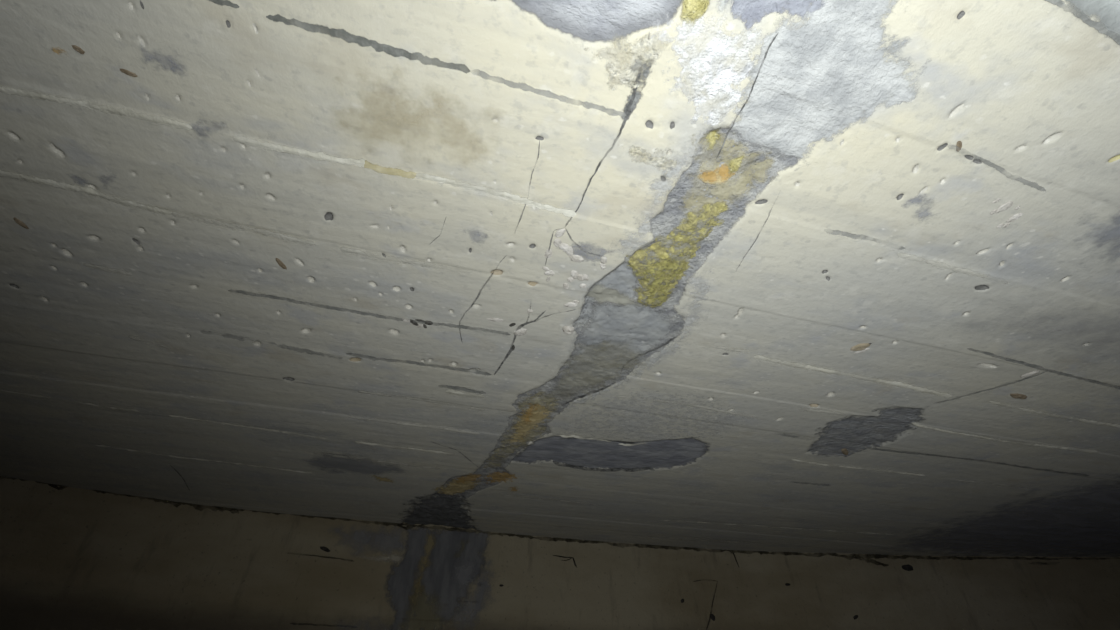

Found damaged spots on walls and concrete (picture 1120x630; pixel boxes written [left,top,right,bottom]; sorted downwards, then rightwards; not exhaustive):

peeling [512,0,682,42]
peeling [1066,0,1120,36]
crack [616,57,653,138]
peeling [721,0,922,170]
corrosion [699,166,734,184]
crack [545,161,602,265]
peeling [559,243,588,307]
spalling [369,281,433,335]
crack [494,308,572,375]
spalling [809,408,924,457]
leakage [371,493,488,630]